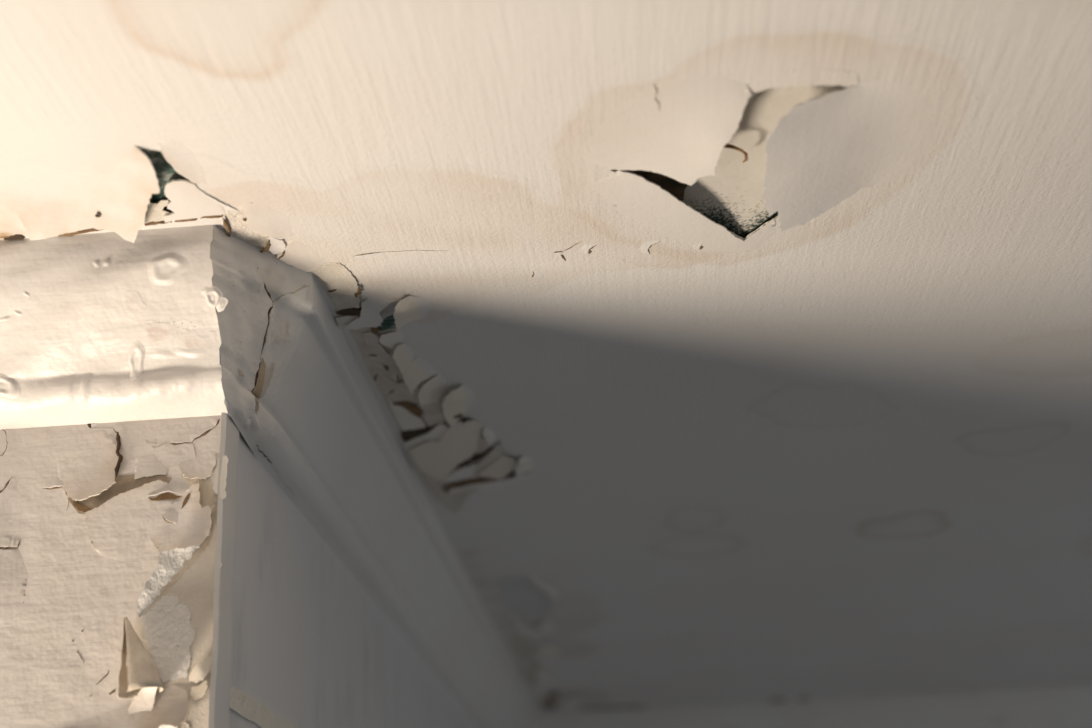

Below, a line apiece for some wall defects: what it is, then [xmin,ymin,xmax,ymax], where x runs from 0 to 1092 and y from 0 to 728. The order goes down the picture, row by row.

damp [94,0,337,86]
damp [166,26,981,328]
peeling [0,138,534,514]
crack [233,259,311,419]
crack [0,429,17,503]
crack [0,537,20,549]
crack [43,417,220,563]
peeling [74,449,229,728]